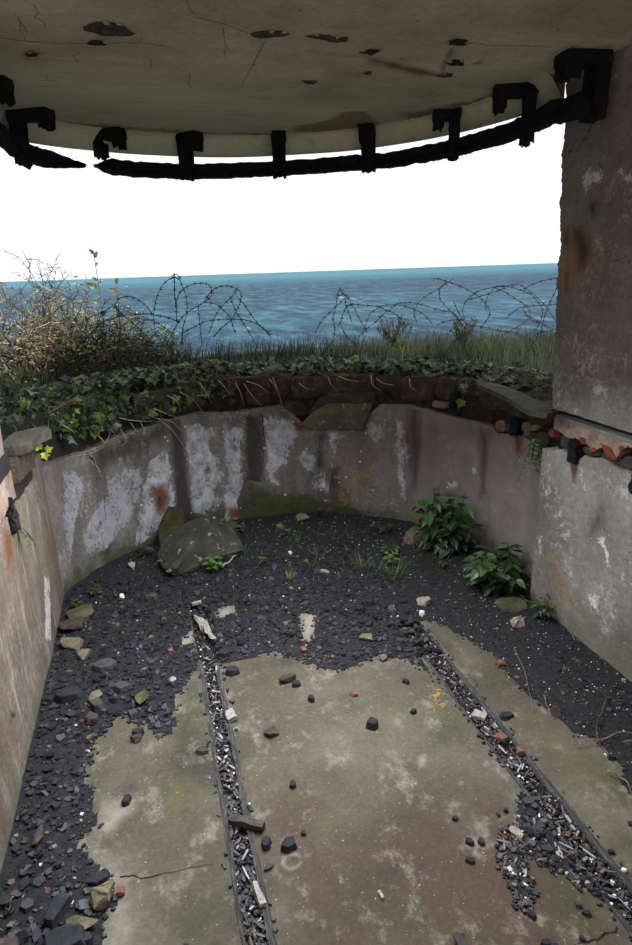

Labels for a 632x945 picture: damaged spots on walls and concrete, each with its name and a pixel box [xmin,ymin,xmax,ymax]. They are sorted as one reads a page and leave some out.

spalling [80,21,135,46]
spalling [250,30,290,39]
spalling [305,34,348,43]
corrosion [297,45,462,80]
water stain [578,160,632,228]
corrosion [557,207,608,306]
corrosion [148,482,172,528]
crack [120,864,211,879]